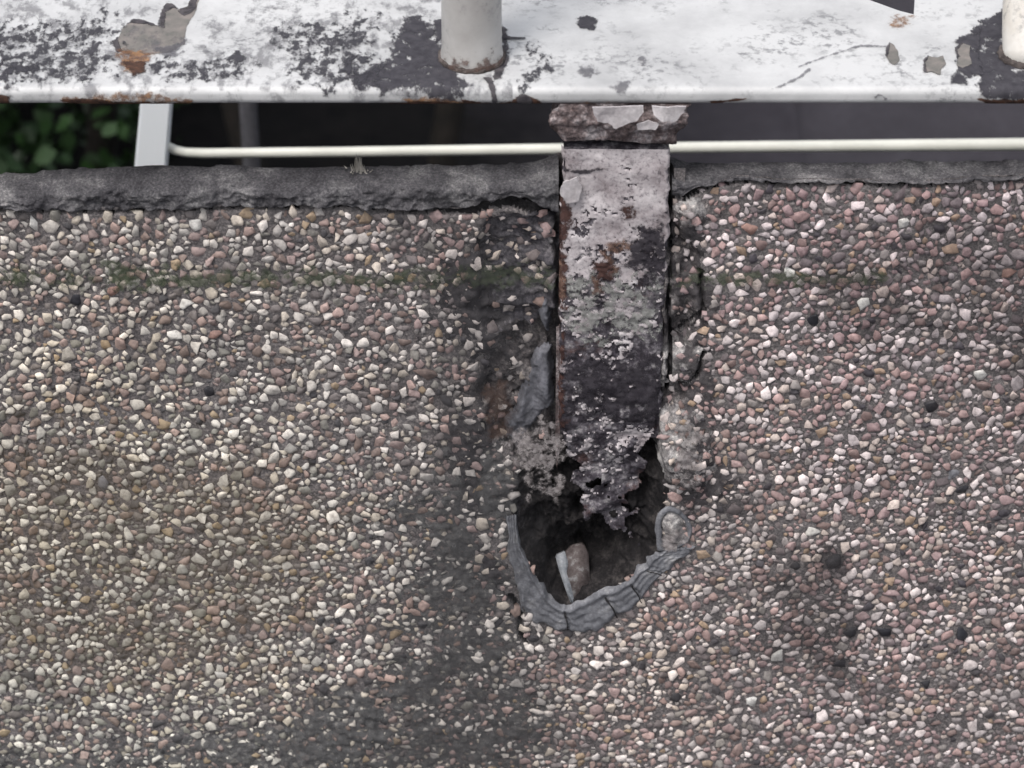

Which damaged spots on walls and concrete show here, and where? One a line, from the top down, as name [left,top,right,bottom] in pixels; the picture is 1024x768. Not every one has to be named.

peeling [112,0,199,57]
corrosion [118,50,155,76]
corrosion [443,51,502,72]
peeling [592,105,686,130]
crack [843,175,1013,187]
corrosion [622,205,636,220]
corrosion [591,240,631,295]
crack [665,163,810,390]
corrosion [558,195,573,428]
spalling [473,145,708,605]
damp [0,349,712,768]